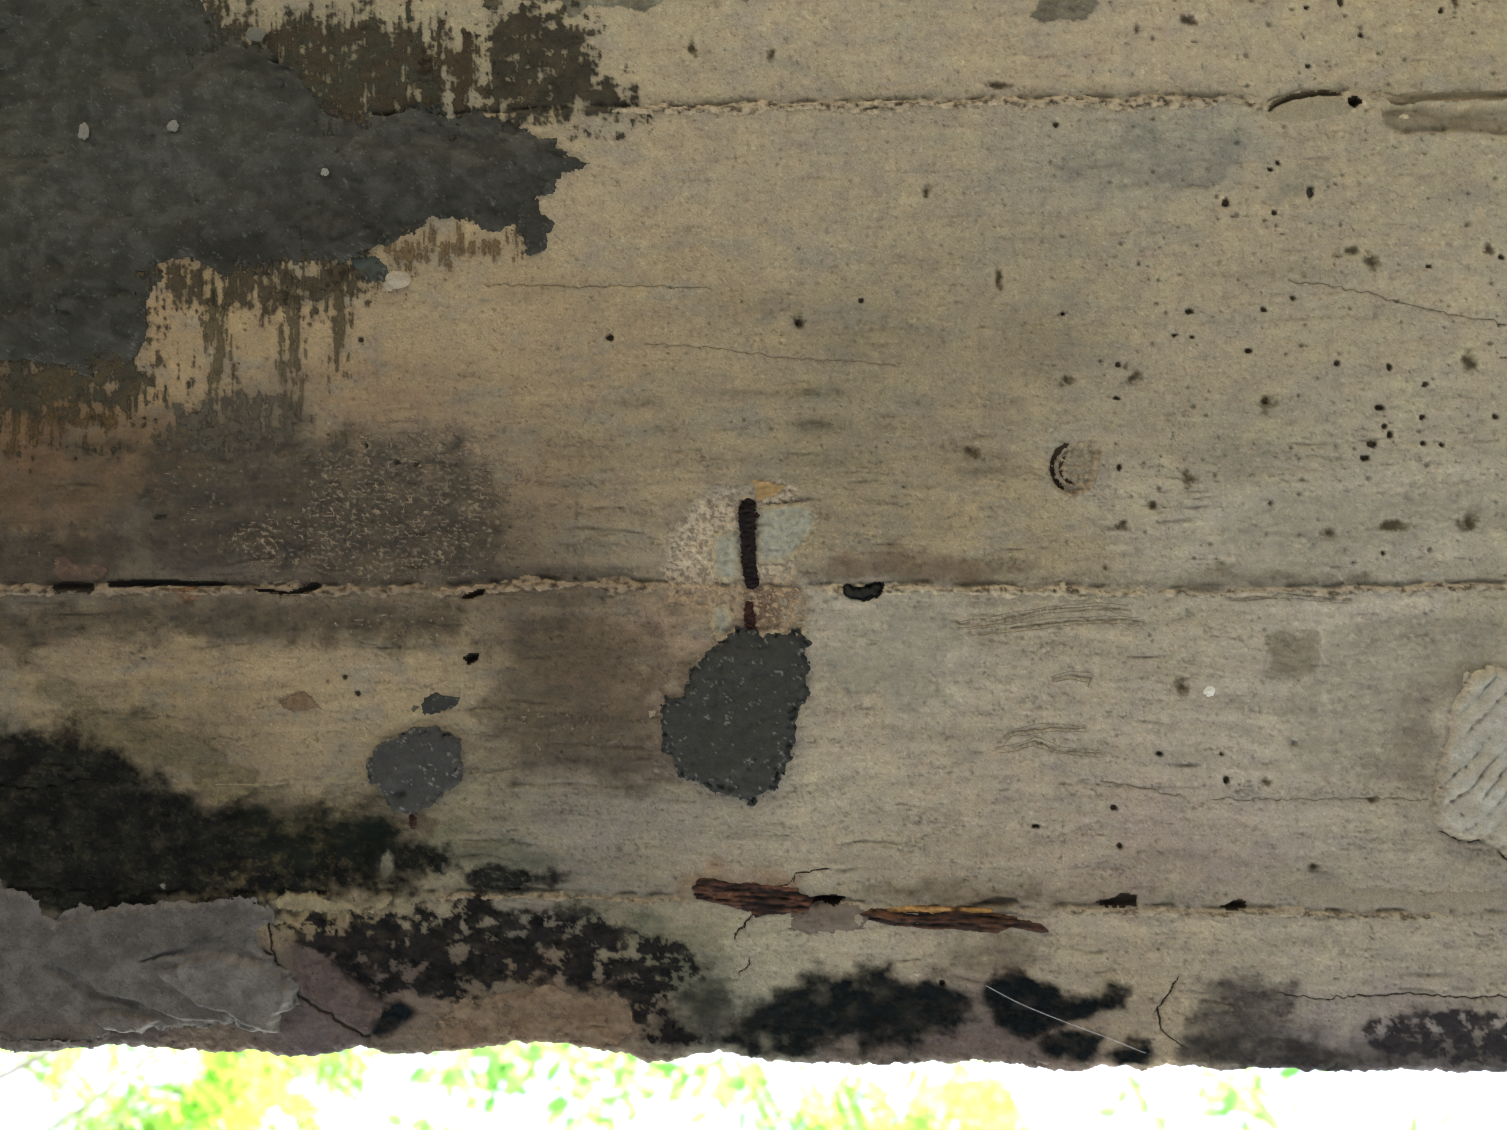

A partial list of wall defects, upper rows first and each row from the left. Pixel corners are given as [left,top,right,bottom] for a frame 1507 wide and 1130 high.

spalling [652,477,821,641]
peeling [193,761,259,806]
peeling [272,891,392,915]
peeling [381,850,394,878]
damp [0,718,1153,1066]
spalling [0,1039,102,1053]
peeling [289,944,384,1035]
damp [1181,981,1507,1073]